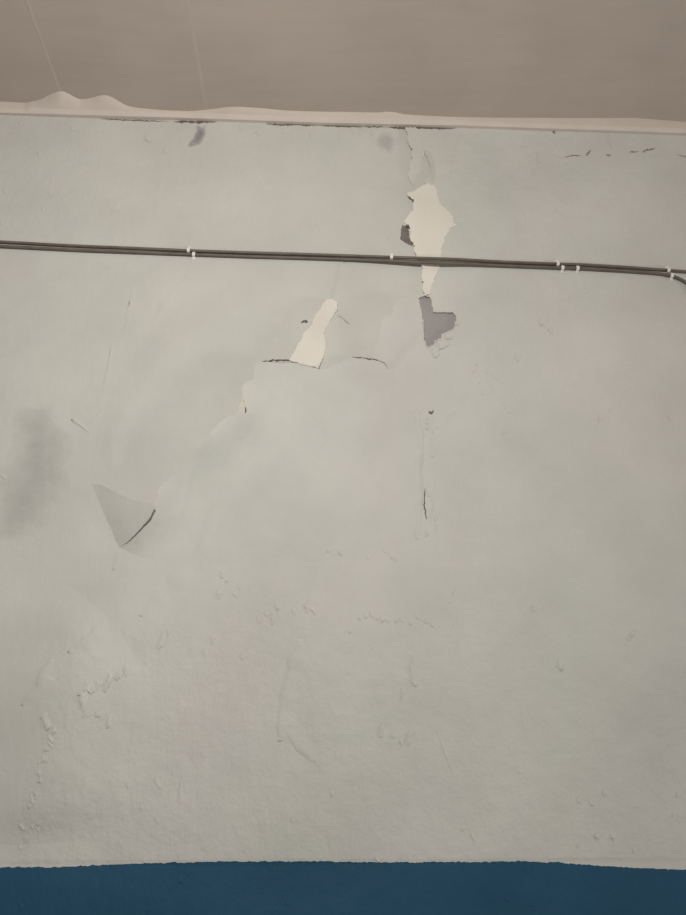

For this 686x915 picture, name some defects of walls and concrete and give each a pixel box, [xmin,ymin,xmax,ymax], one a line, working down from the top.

peeling [93,127,460,617]